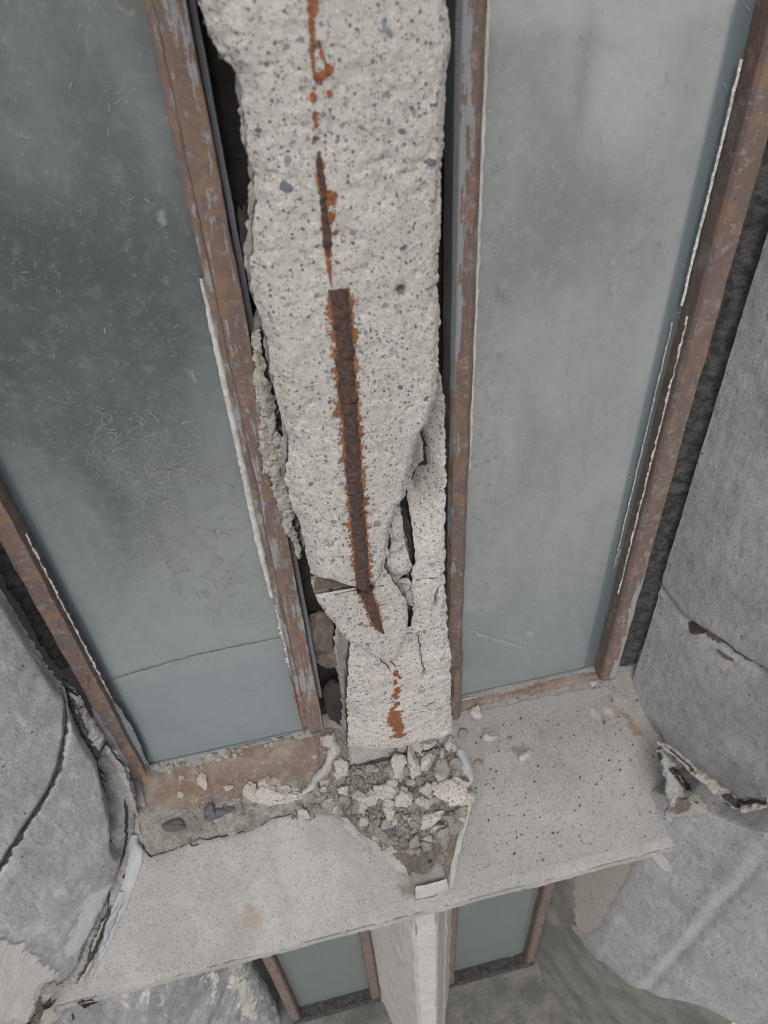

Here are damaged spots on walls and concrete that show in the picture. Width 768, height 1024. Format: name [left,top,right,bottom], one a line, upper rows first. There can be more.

rust [307,0,339,287]
spalling [251,309,304,559]
spalling [324,288,412,634]
crack [313,577,375,594]
crack [0,684,293,965]
peeling [300,732,340,796]
rust [387,670,406,738]
spalling [340,745,459,879]
crack [379,634,426,676]
spalling [657,741,768,819]